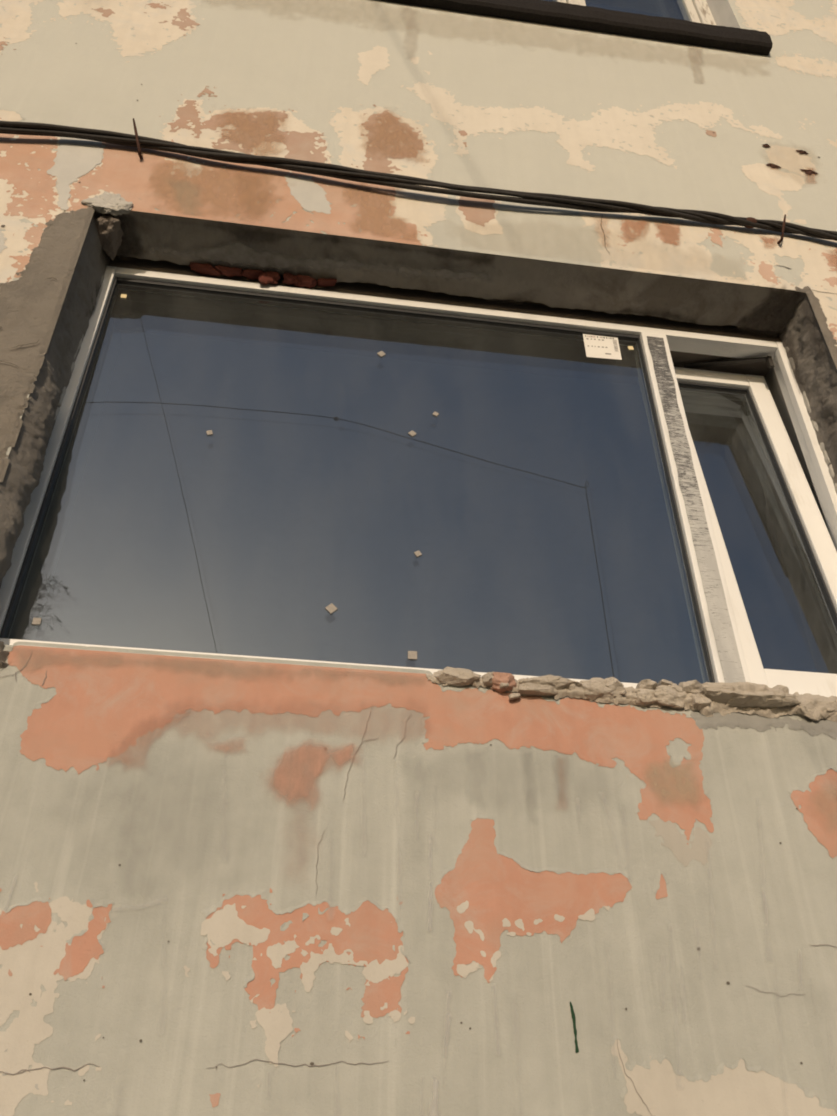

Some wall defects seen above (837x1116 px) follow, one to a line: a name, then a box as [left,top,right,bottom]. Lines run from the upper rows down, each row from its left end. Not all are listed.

peeling [0,0,204,62]
peeling [732,0,837,83]
peeling [0,45,837,346]
spalling [802,391,837,494]
peeling [6,642,837,867]
peeling [0,882,115,1116]
crack [206,1059,387,1069]
peeling [200,886,415,1067]
peeling [435,814,632,983]
peeling [607,1036,837,1116]